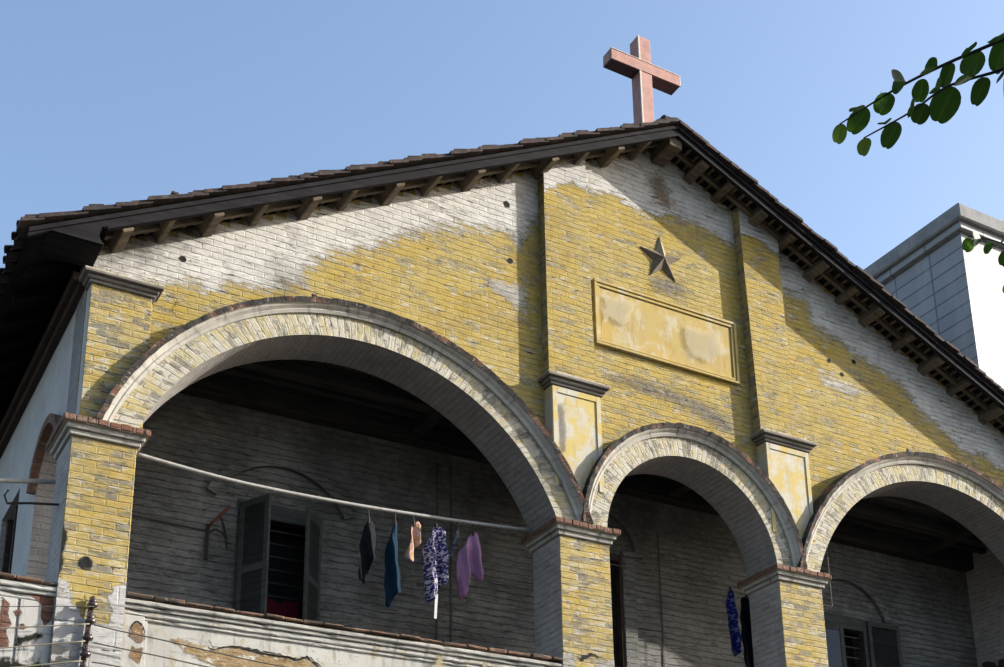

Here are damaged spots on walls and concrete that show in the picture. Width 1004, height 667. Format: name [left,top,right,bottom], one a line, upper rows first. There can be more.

peeling [94,151,1004,469]
spalling [0,597,25,647]
peeling [21,578,146,667]
spalling [171,638,320,667]
crack [209,641,321,667]